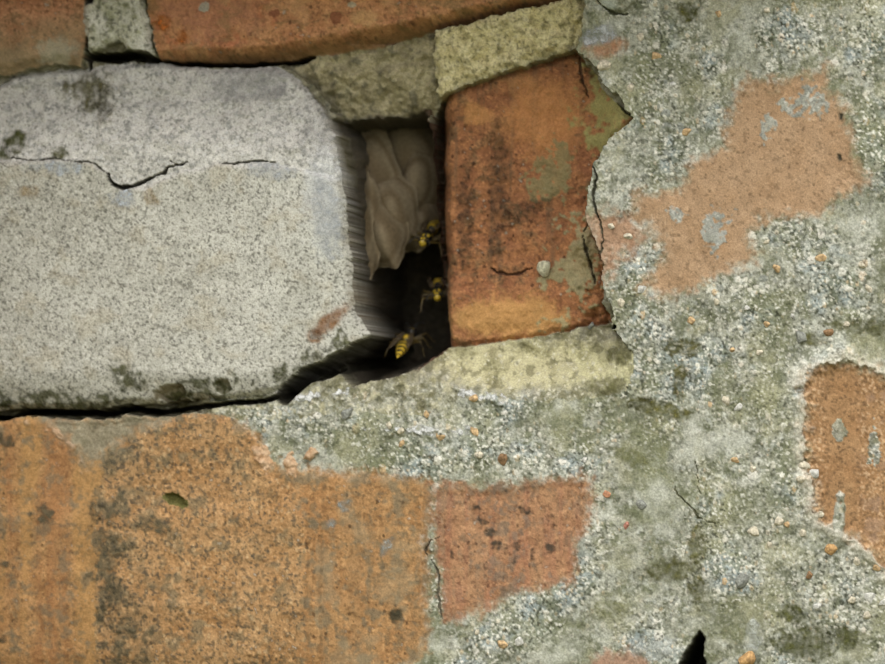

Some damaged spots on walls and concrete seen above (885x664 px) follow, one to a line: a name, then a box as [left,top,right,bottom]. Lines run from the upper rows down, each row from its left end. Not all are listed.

crack [579,57,590,97]
crack [11,158,189,190]
crack [222,159,269,167]
crack [583,165,604,283]
peeling [585,66,872,301]
peeling [152,384,190,404]
crack [0,338,414,422]
peeling [802,361,885,568]
spalling [41,413,320,664]